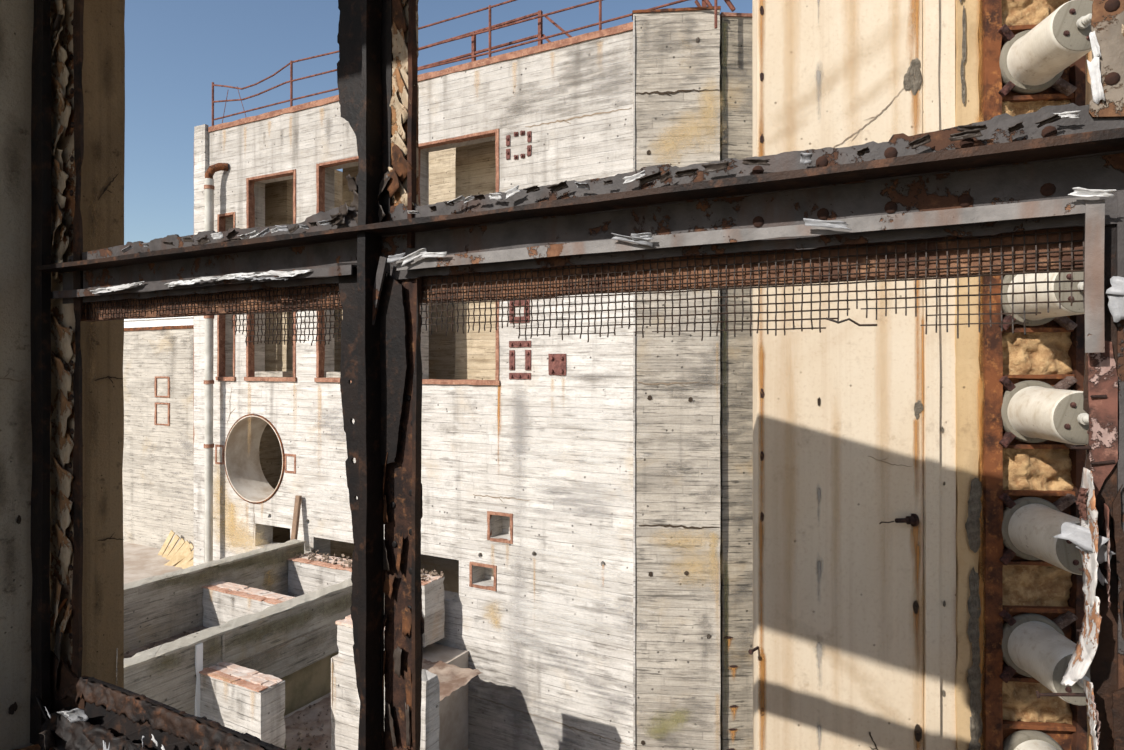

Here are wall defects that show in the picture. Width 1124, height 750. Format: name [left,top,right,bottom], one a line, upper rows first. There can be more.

peeling [50,0,71,280]
crack [833,88,904,148]
crack [639,522,718,530]
peeling [1053,467,1116,750]